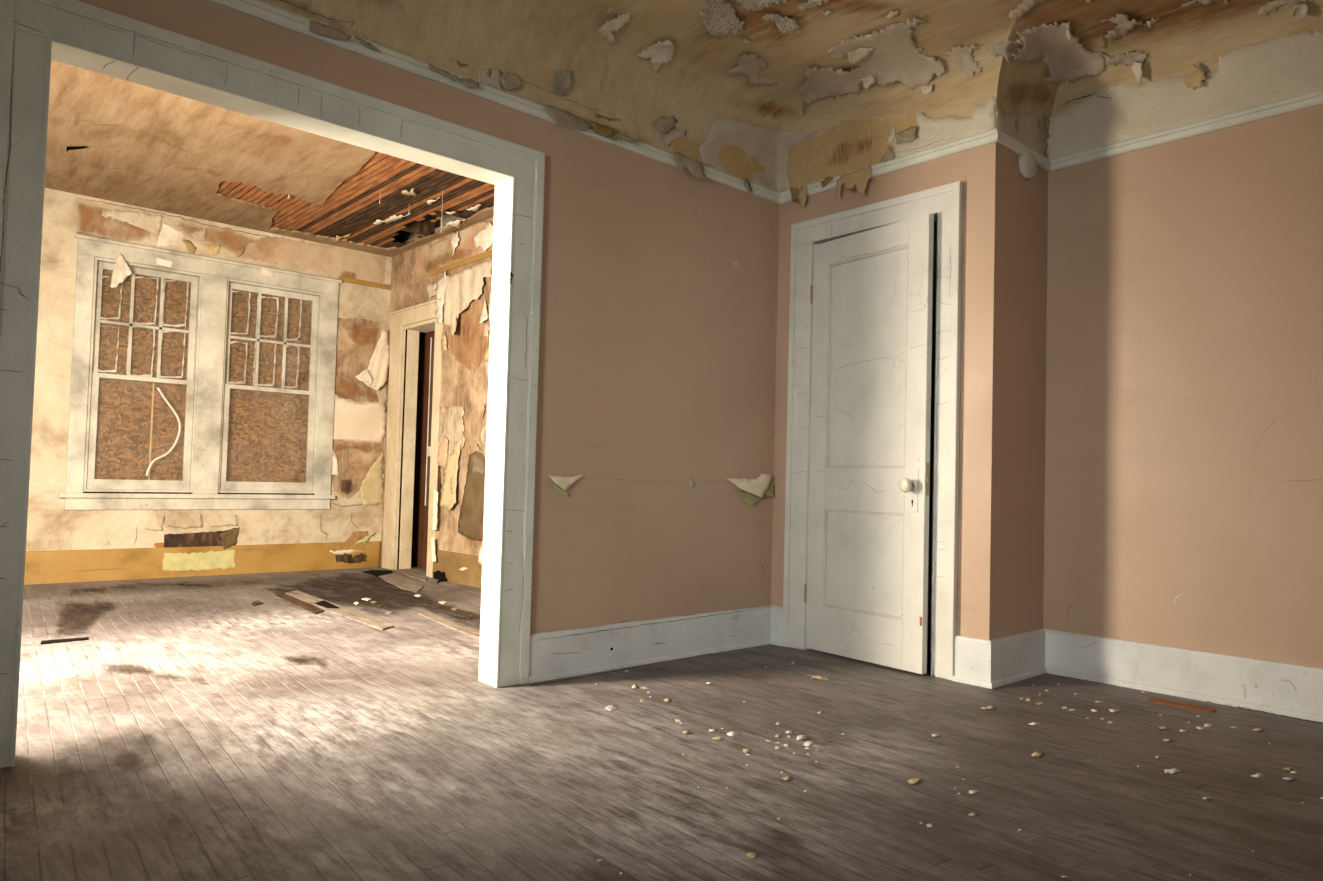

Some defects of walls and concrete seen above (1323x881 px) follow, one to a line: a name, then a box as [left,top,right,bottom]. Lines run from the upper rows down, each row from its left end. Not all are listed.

crack [102,25,227,84]
peeling [541,69,639,143]
peeling [653,0,1323,208]
crack [0,21,44,311]
crack [74,198,293,241]
peeling [426,271,446,323]
flaking render [335,318,386,403]
crack [477,310,528,464]
flaking render [331,439,384,499]
spalling [154,527,240,549]
spalling [330,530,377,564]
spalling [433,567,468,583]